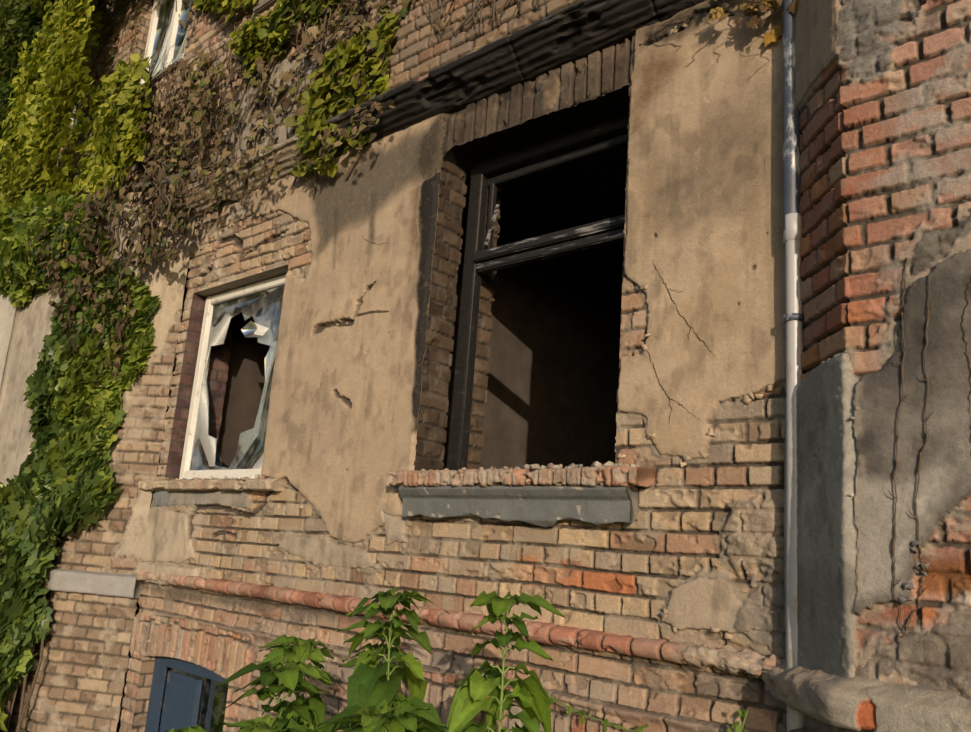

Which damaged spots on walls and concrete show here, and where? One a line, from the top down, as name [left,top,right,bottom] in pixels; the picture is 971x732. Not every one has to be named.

crack [313,281,389,334]
crack [653,262,715,356]
crack [646,350,705,424]
crack [960,277,971,443]
flaking render [616,353,971,678]